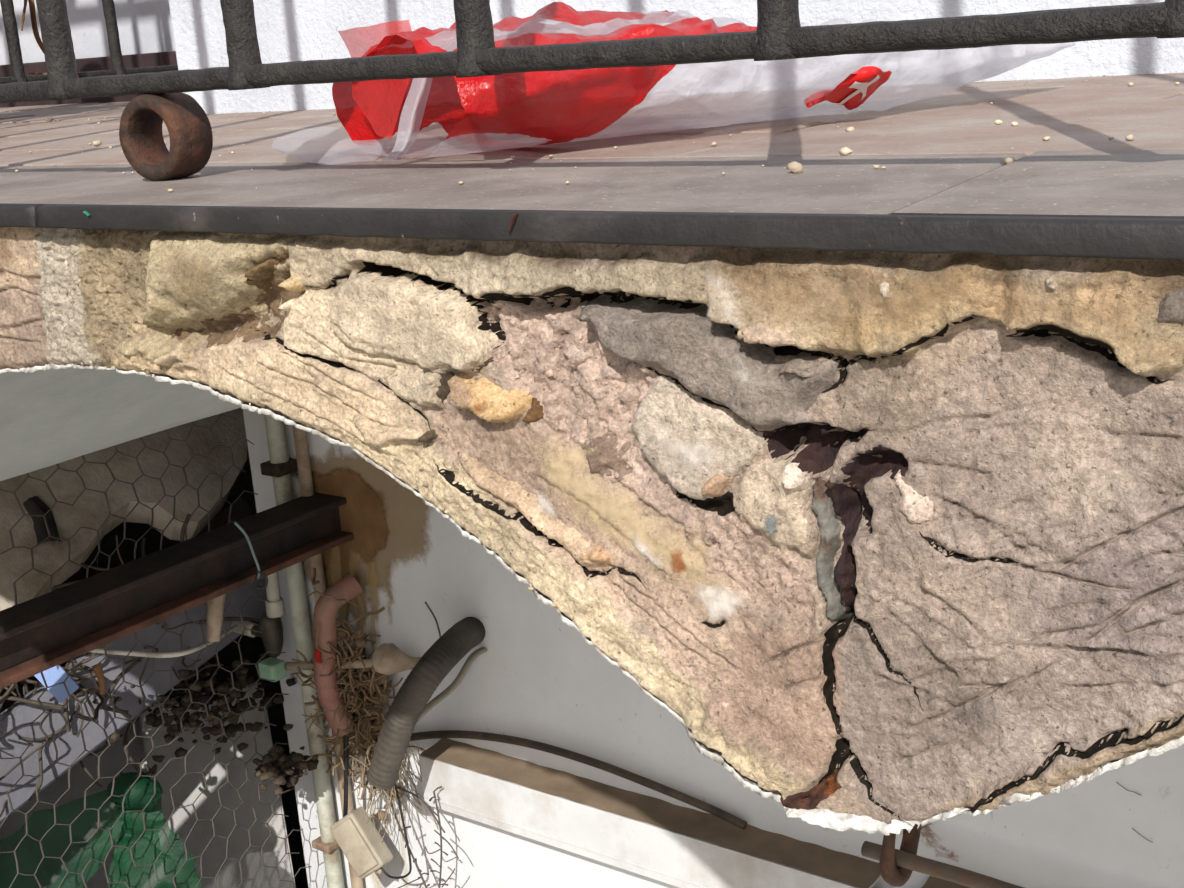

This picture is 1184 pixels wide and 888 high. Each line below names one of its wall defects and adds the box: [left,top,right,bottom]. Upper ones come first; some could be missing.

spalling [119,268,306,365]
crack [255,330,431,431]
crack [305,262,739,362]
crack [765,316,983,393]
crack [1006,325,1184,384]
spalling [328,272,908,621]
crack [433,461,646,588]
crack [919,532,1019,563]
crack [802,583,922,829]
peeling [786,807,964,835]
peeling [1000,792,1038,807]
crack [958,715,1184,816]